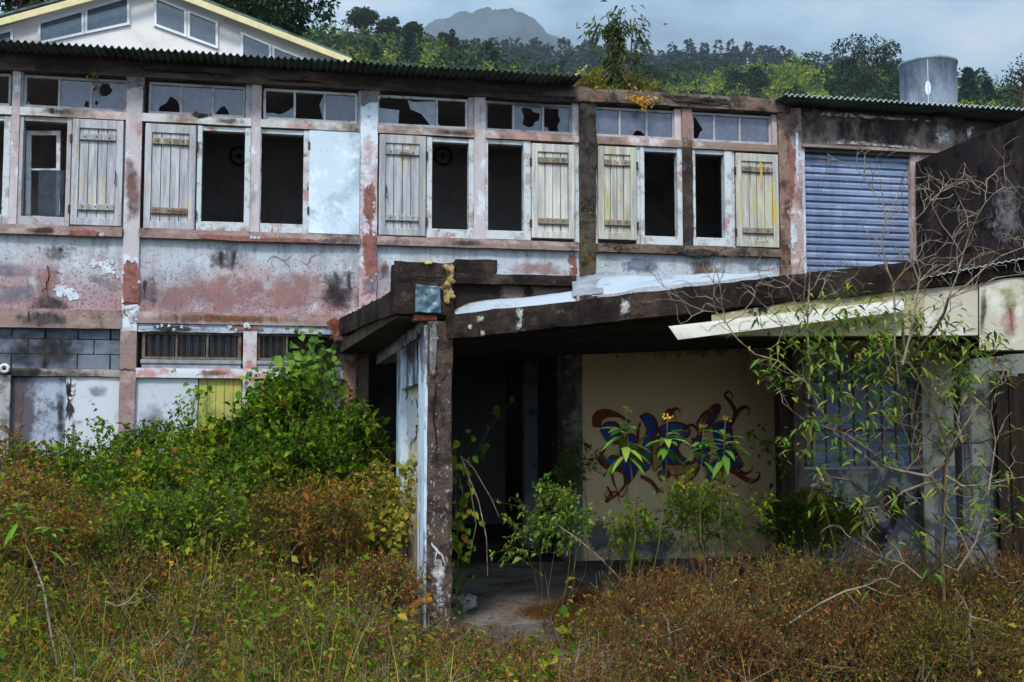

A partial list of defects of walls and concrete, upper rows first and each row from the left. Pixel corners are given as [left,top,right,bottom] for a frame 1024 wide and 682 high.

leakage [822,113,950,149]
peeling [362,181,378,282]
peeling [52,279,79,301]
peeling [87,259,140,324]
leakage [142,248,389,309]
peeling [407,396,418,446]